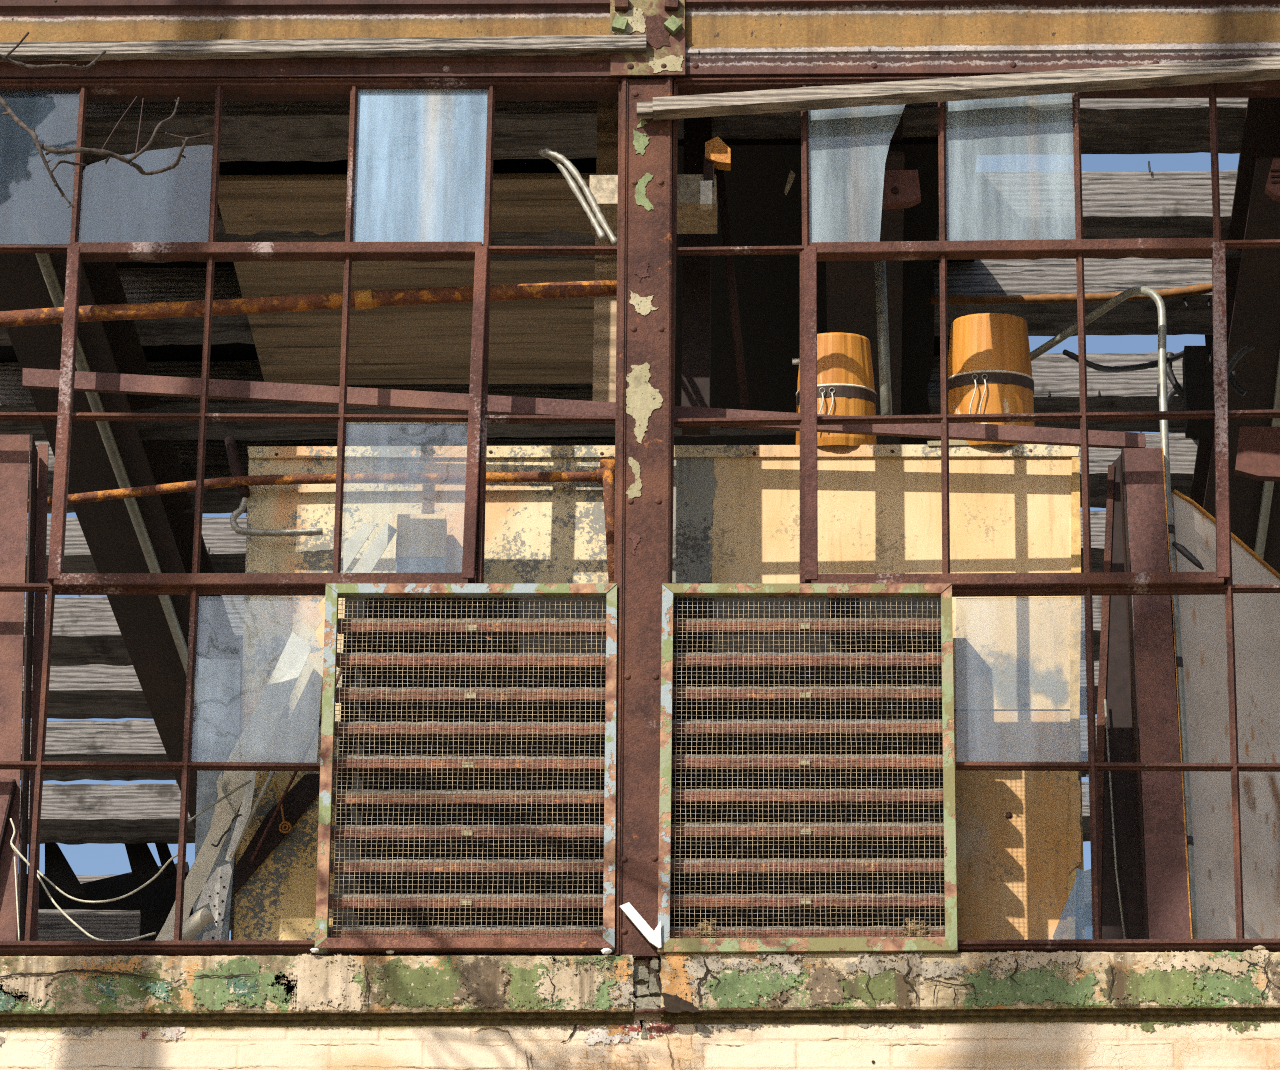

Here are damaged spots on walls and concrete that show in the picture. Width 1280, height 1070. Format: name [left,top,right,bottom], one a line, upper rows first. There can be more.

peeling [612,8,684,74]
peeling [626,362,663,444]
spalling [0,968,66,1011]
crack [0,969,256,983]
spalling [189,953,464,1011]
crack [545,971,744,1070]
crack [648,965,662,995]
peeling [501,952,814,1049]
crack [697,956,720,1008]
crack [903,955,977,1008]
peeling [839,950,1271,1034]
crack [1243,958,1280,1005]